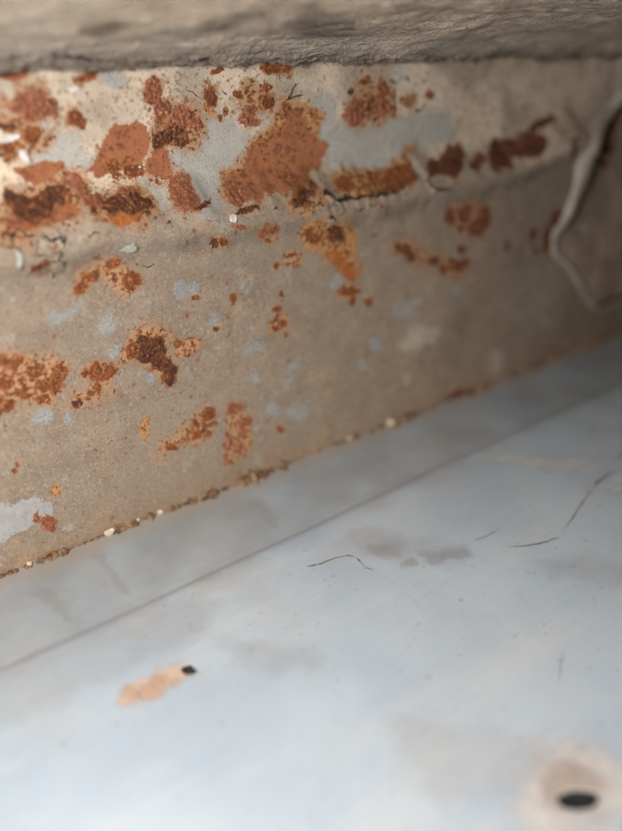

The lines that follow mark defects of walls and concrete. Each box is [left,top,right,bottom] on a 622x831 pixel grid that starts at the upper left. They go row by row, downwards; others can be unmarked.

rust [0,62,563,307]
crack [323,169,453,231]
rust [266,290,290,339]
rust [0,313,205,419]
rust [137,397,255,472]
crack [512,454,622,547]
crack [309,555,373,570]
rust [115,663,199,707]